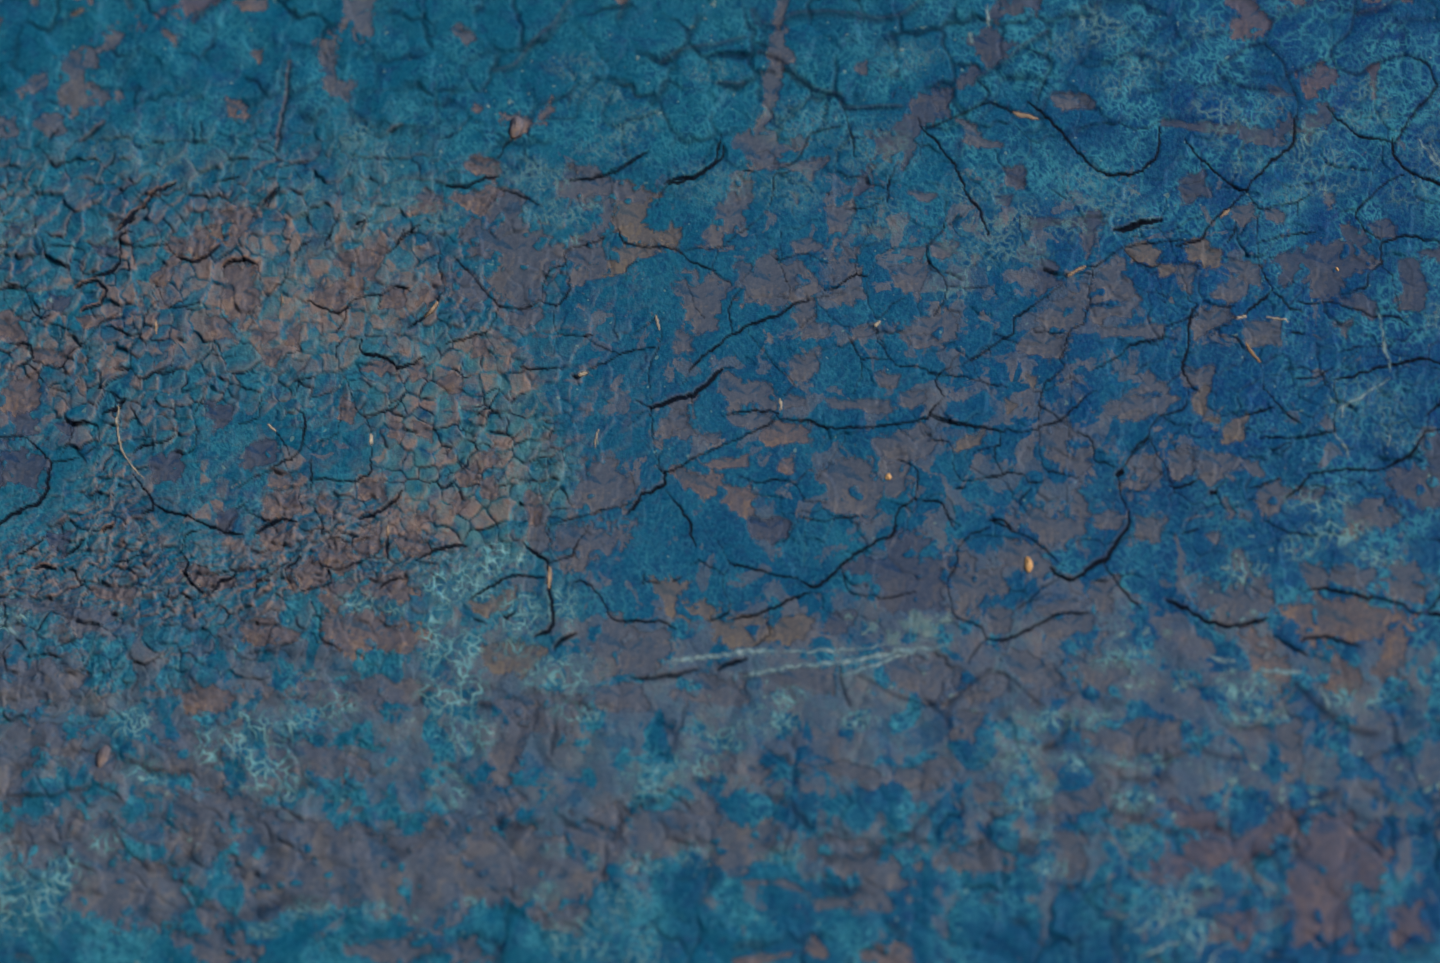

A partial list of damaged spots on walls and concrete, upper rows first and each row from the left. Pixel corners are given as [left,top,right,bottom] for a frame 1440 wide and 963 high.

peeling [1016,209,1440,359]
crack [0,56,1440,807]
peeling [841,418,1168,639]
peeling [1105,365,1325,544]
peeling [1187,549,1426,701]
crack [0,833,117,931]
peeling [0,575,1016,963]
crack [534,844,698,963]
crack [988,709,1108,875]
crack [1113,756,1164,850]
crack [1135,878,1219,945]
peeling [1032,779,1396,954]